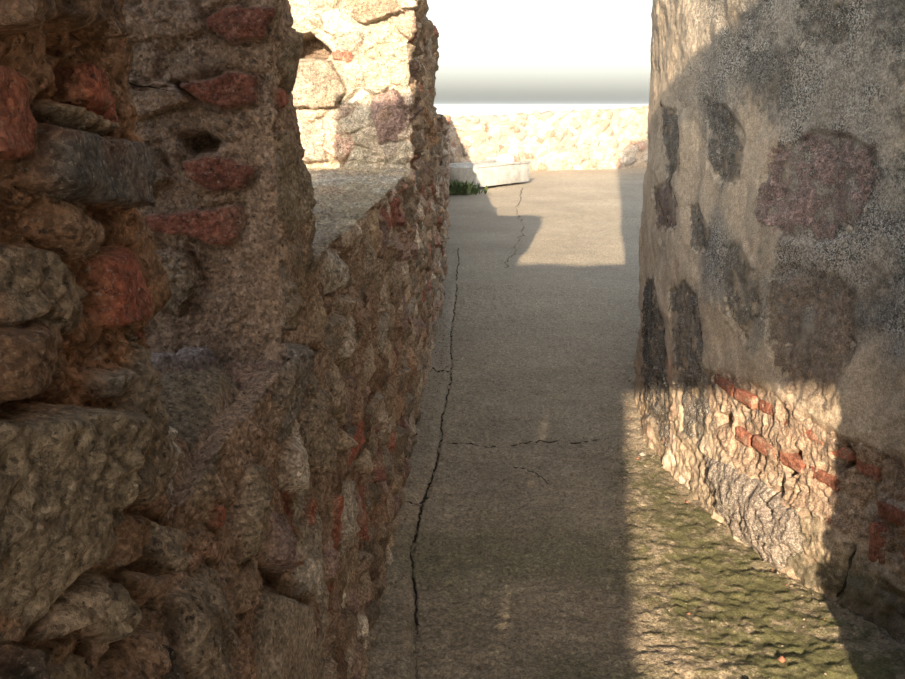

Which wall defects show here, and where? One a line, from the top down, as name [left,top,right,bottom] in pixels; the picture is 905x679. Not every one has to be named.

crack [504,188,525,268]
crack [407,248,609,672]